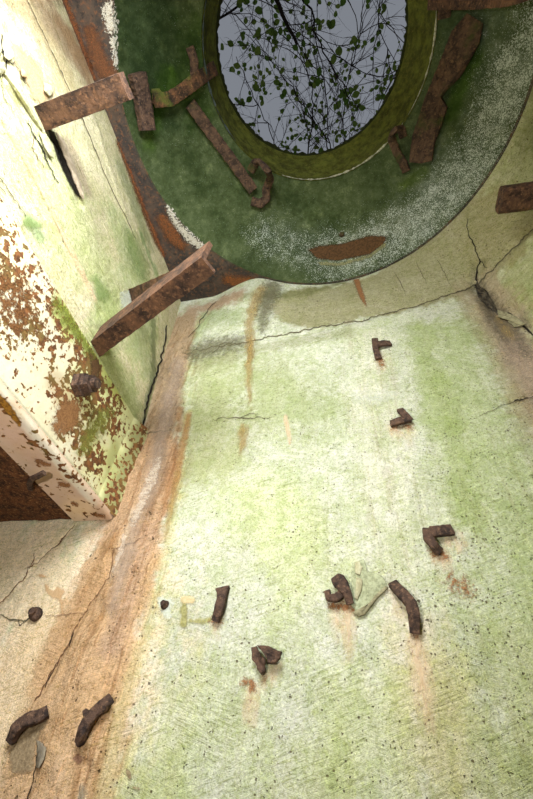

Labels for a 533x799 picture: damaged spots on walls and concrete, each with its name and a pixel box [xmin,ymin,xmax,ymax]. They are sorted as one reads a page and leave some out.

flaking render [13,43,54,103]
spalling [38,130,84,199]
crack [185,219,533,354]
rust [0,395,21,427]
rust [51,398,83,437]
rust [88,348,101,378]
crack [143,325,173,433]
crack [0,525,140,701]